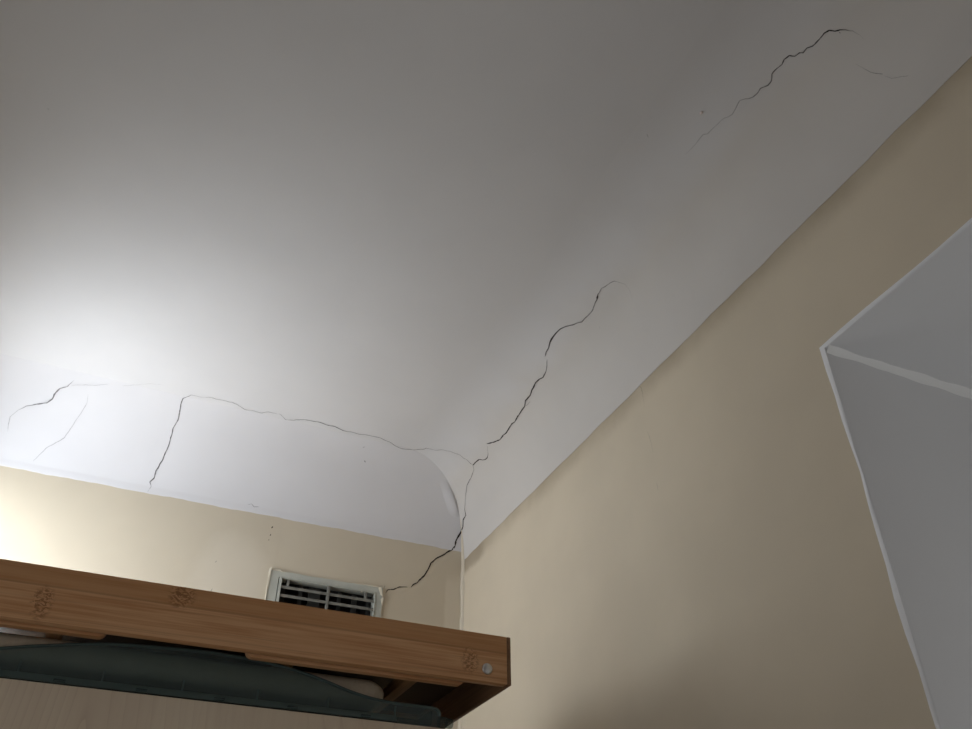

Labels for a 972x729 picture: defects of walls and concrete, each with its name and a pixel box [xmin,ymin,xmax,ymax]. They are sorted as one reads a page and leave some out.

crack [740,29,848,101]
crack [150,396,189,485]
crack [223,281,614,592]